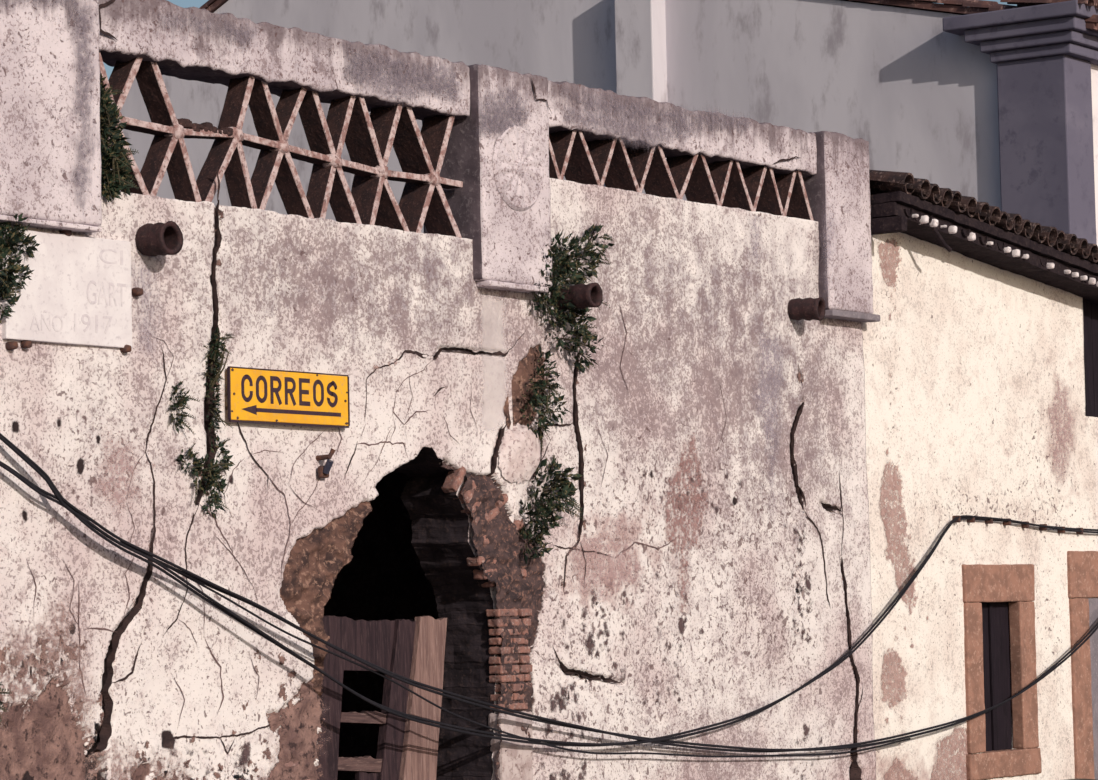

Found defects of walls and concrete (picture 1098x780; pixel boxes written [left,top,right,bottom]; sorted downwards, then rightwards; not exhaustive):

flaking render [0,624,109,780]
crack [63,337,174,753]
flaking render [124,741,225,780]
spalling [239,501,372,780]
crack [166,167,523,754]
spalling [440,459,546,780]
flaking render [503,344,548,429]
crack [552,645,623,683]
crack [531,349,680,587]
crack [619,304,631,399]
crack [790,364,863,780]